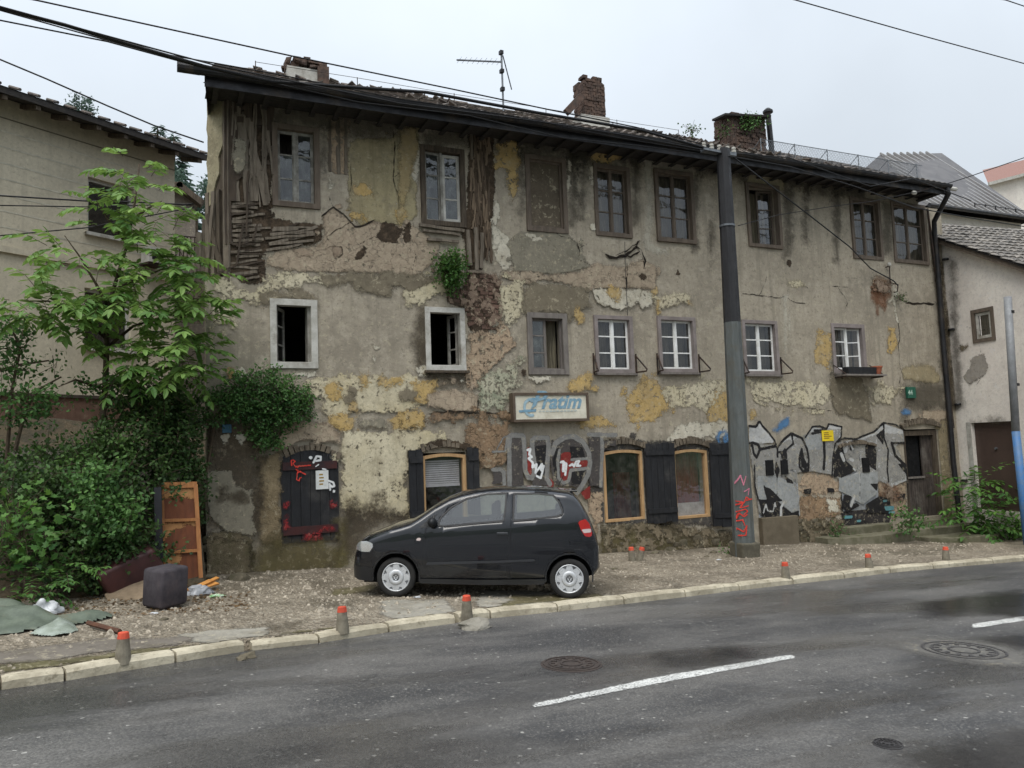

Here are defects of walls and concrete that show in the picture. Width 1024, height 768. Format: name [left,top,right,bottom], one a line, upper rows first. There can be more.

crack [322,203,416,262]
crack [557,233,646,283]
corrosion [871,291,890,315]
flaking render [203,126,691,575]
peeling [813,328,832,370]
damp [207,421,265,530]
flaking render [576,372,733,553]